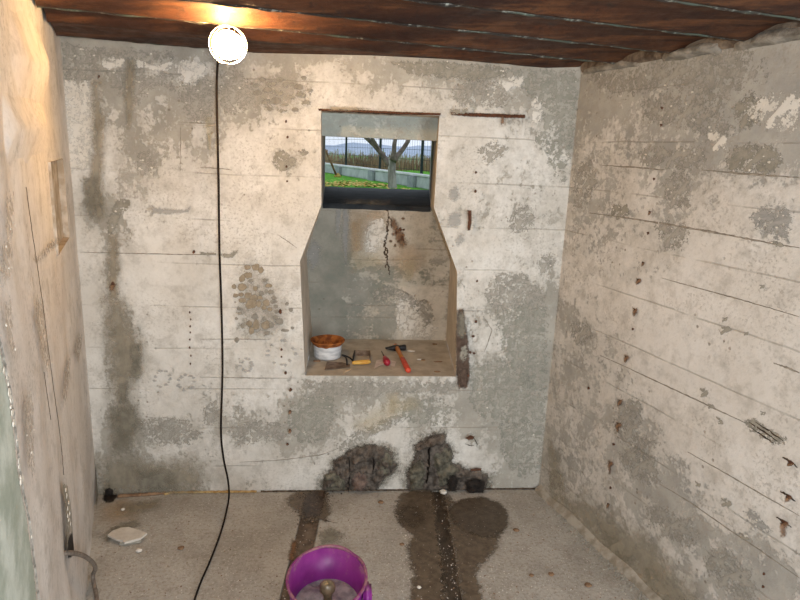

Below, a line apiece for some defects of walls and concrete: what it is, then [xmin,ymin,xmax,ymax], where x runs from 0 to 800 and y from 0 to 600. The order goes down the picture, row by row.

rust [451,109,525,124]
peeling [392,48,800,210]
crack [346,210,420,275]
rust [390,217,407,248]
water stain [107,236,141,450]
peeling [232,264,298,375]
spalling [227,378,493,493]
peeling [745,411,787,445]
water stain [287,491,342,544]
water stain [394,490,508,600]
rust [776,517,791,537]